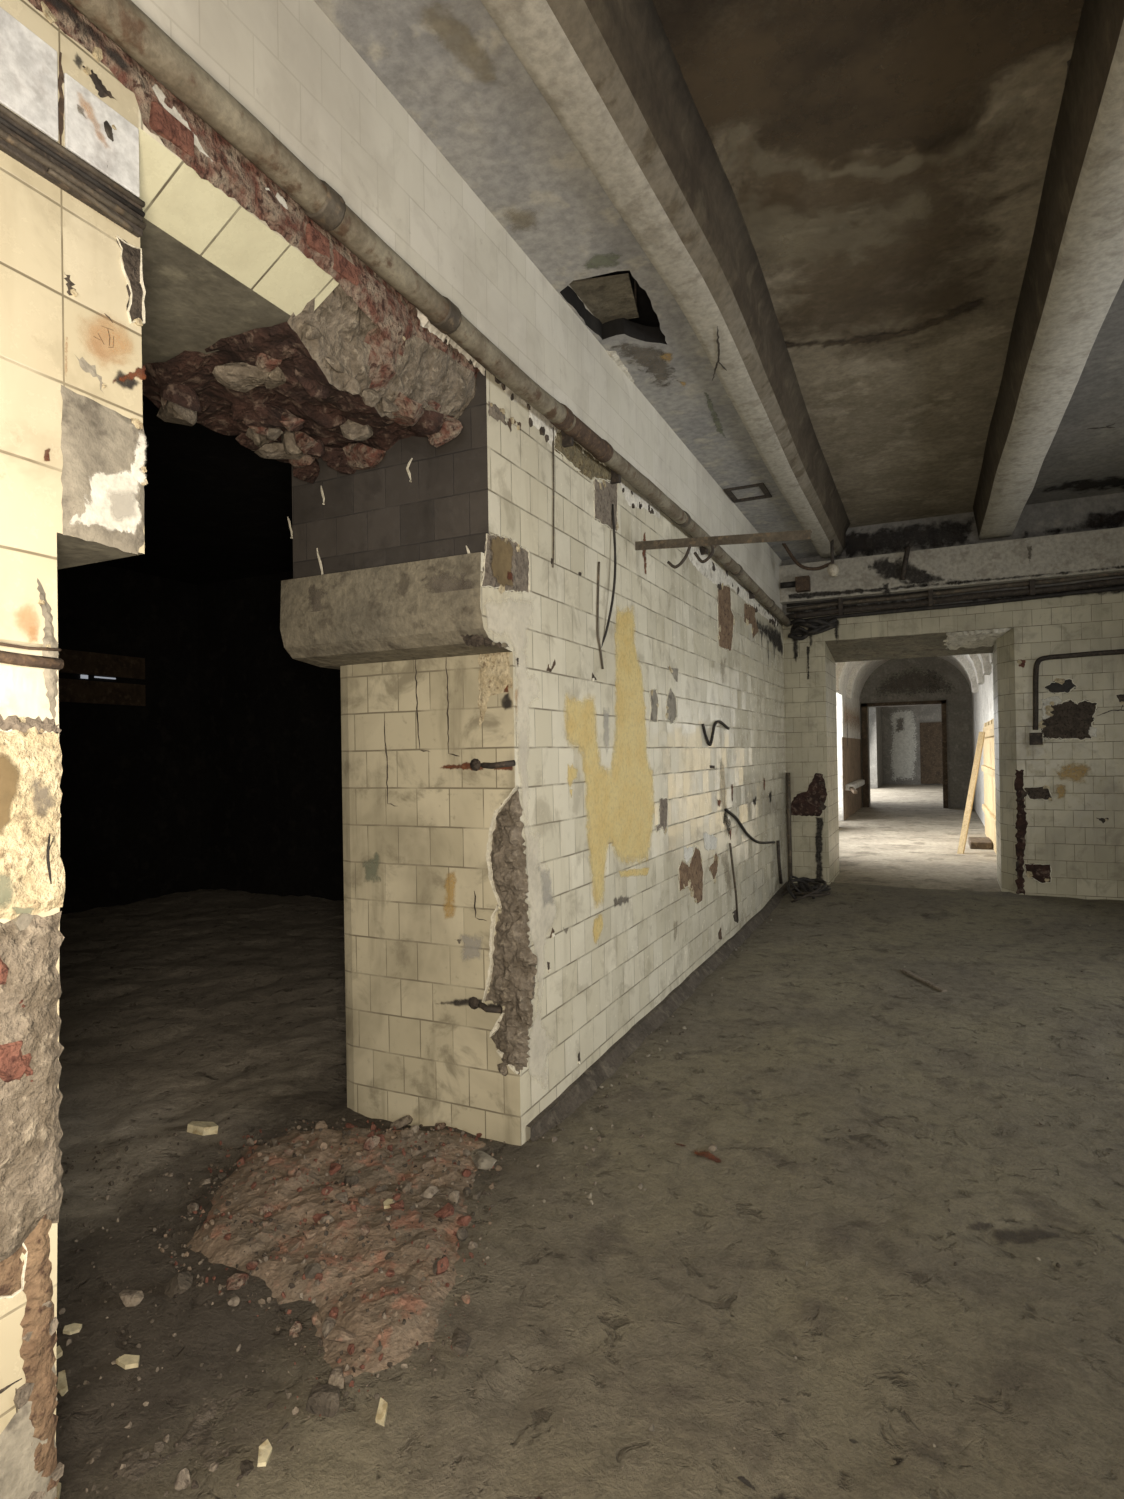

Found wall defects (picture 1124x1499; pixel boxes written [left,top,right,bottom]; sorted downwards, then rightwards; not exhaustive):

leakage [652,0,1084,348]
flaking render [28,0,660,554]
leakage [584,255,619,268]
peeling [685,547,779,652]
peeling [1038,678,1098,741]
flaking render [786,773,827,817]
peeling [678,832,719,905]
spalling [482,786,552,1076]
flaking render [0,578,65,1499]